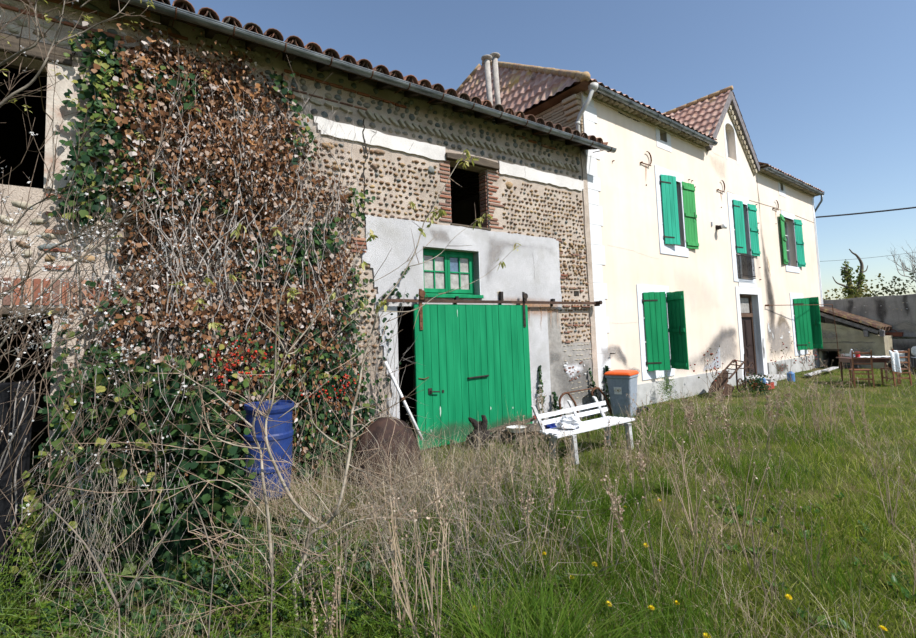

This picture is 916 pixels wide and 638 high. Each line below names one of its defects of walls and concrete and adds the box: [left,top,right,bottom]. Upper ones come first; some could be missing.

damp [763,248,790,352]
damp [876,300,886,321]
damp [604,347,635,370]
damp [700,331,736,370]